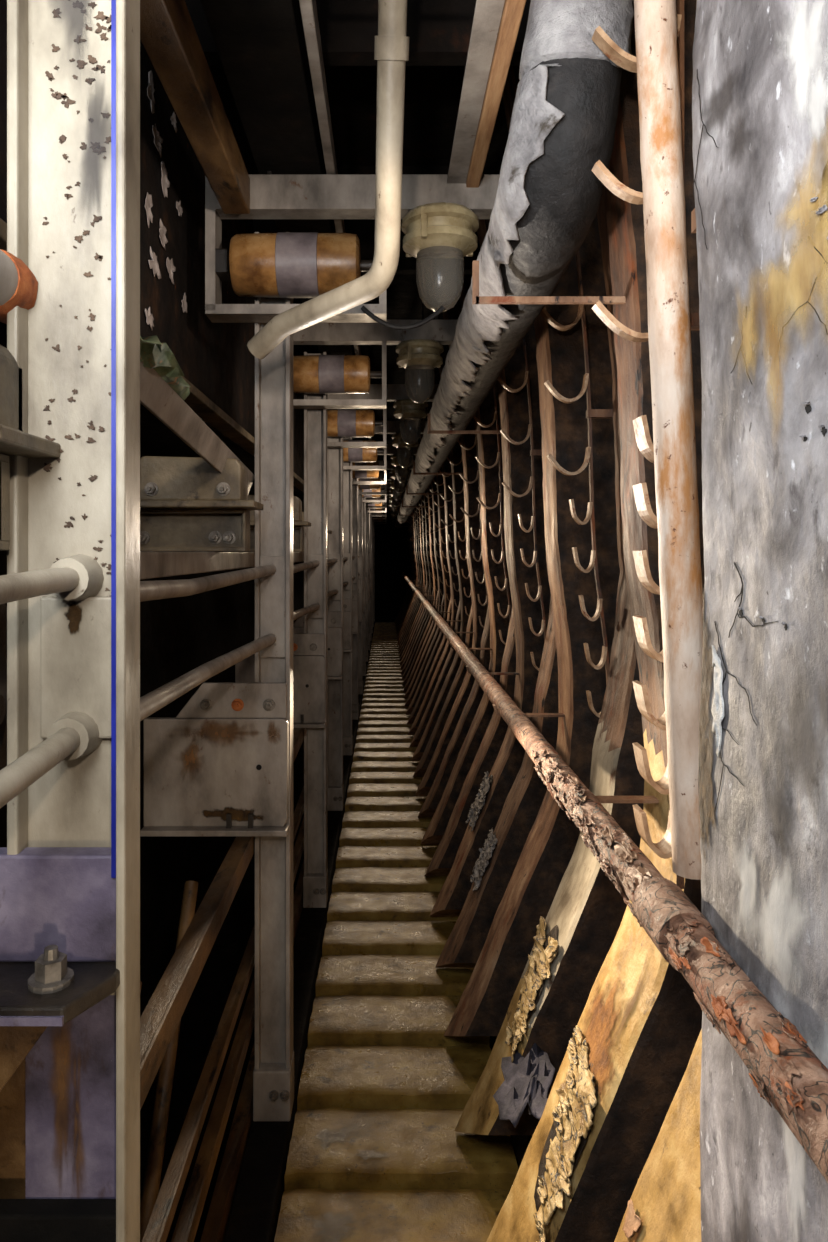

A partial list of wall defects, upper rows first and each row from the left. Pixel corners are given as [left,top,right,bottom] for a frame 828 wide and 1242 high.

water stain [788,0,828,136]
water stain [742,176,828,407]
rust [182,723,277,772]
rust [203,807,263,822]
crack [712,562,777,815]
peeling [505,916,558,1063]
rust [583,978,640,1094]
peeling [533,1025,598,1242]
rust [622,1199,643,1242]